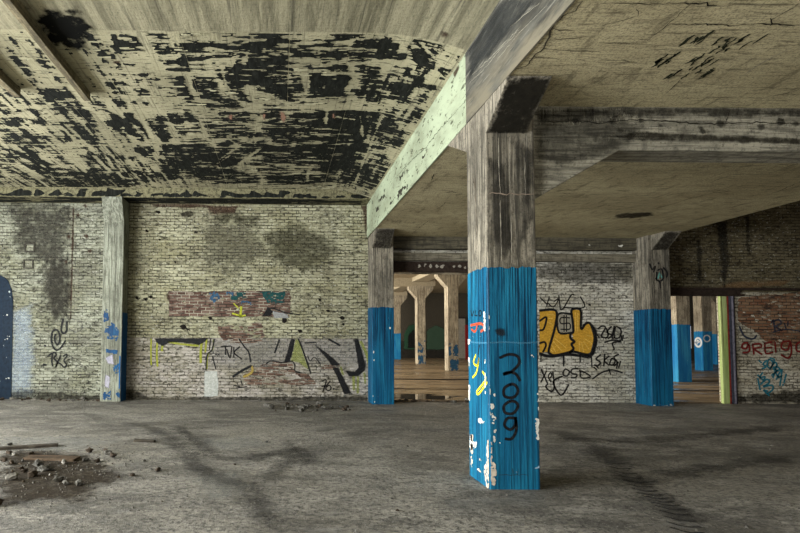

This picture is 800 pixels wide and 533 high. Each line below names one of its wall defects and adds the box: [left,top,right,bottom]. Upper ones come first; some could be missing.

crack [515,1,737,70]
crack [758,3,799,26]
peeling [0,32,460,214]
water stain [489,77,800,207]
water stain [265,229,329,271]
water stain [491,162,532,258]
water stain [716,221,729,287]
peeling [469,375,500,488]